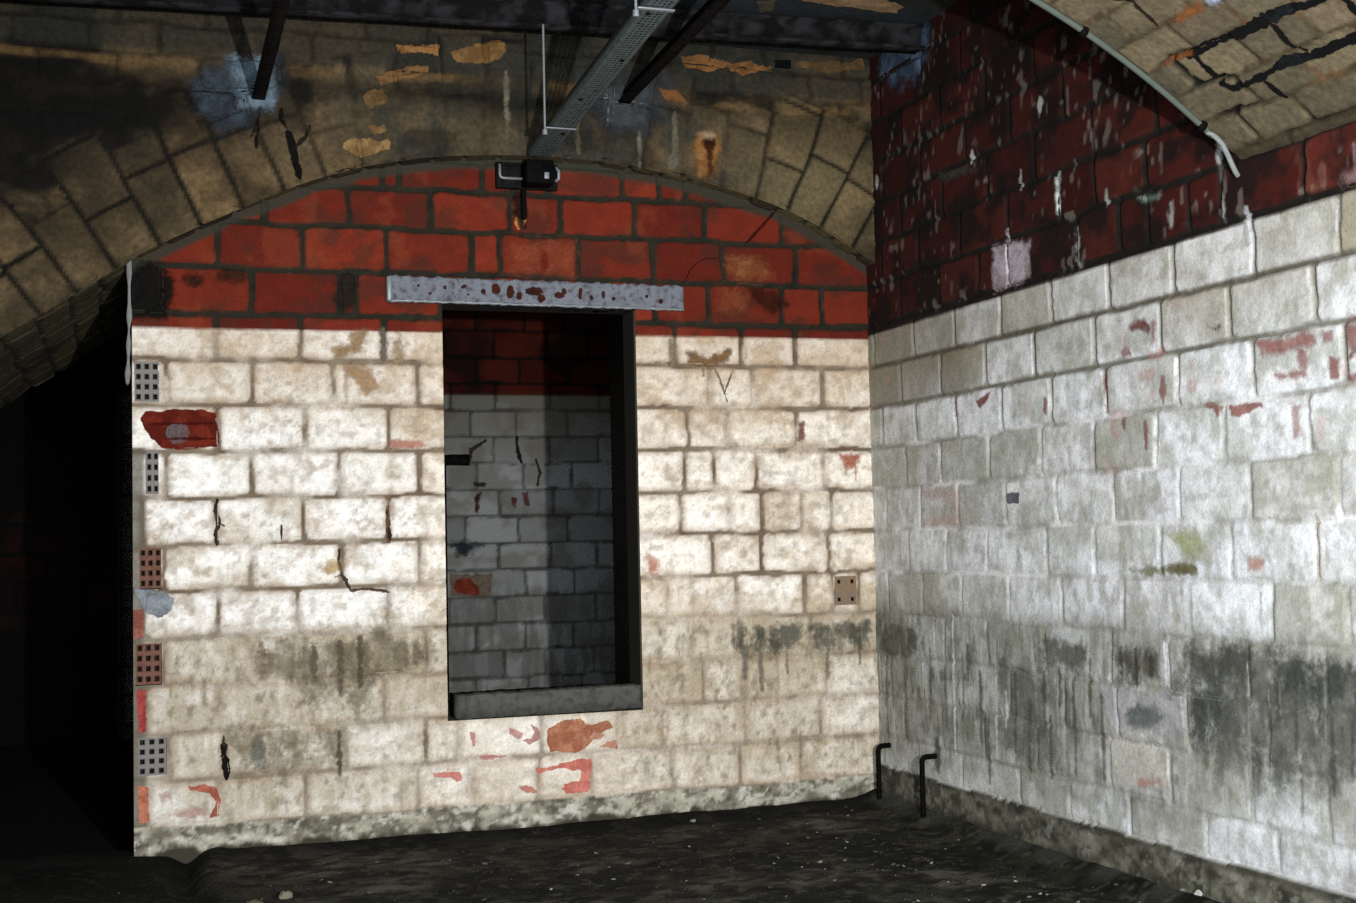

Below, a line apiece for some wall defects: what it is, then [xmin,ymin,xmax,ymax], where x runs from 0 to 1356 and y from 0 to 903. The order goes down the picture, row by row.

crack [1114,0,1158,26]
crack [1186,0,1356,98]
rust [694,131,721,177]
peeling [1256,324,1356,380]
flaking render [141,409,219,450]
peeling [1206,403,1262,417]
crack [335,548,389,593]
leakage [260,629,425,704]
leakage [1116,648,1159,685]
leakage [732,614,1106,784]
leakage [1170,645,1356,798]
peeling [509,718,618,794]